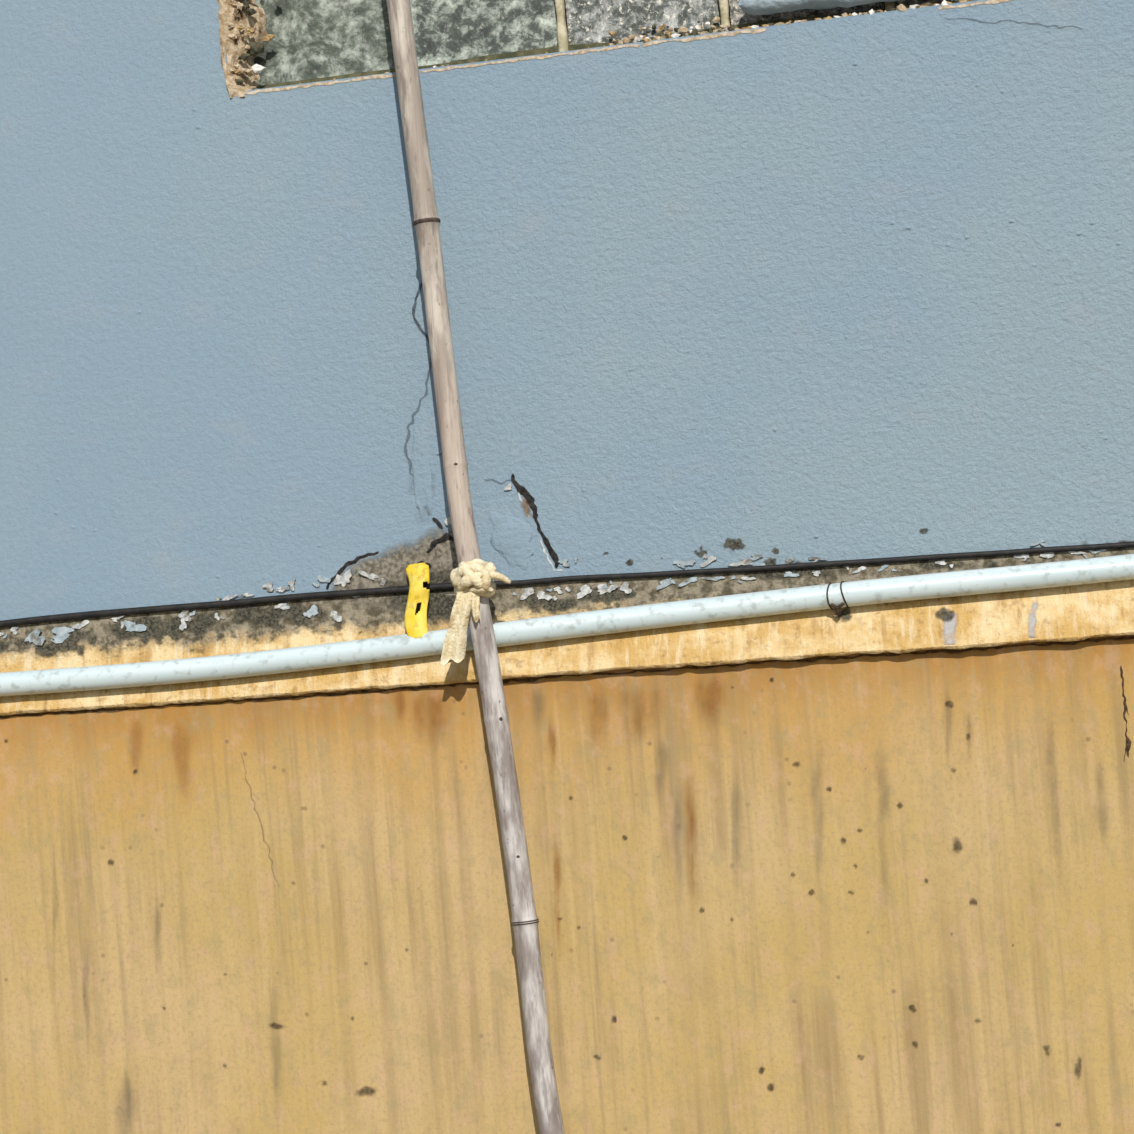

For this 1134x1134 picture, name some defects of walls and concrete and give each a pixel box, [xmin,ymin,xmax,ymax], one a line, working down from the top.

crack [404,283,432,477]
crack [486,474,562,571]
spalling [303,517,458,622]
peeling [657,554,765,590]
peeling [0,619,90,645]
water stain [0,627,96,656]
peeling [111,606,147,632]
water stain [112,611,220,642]
water stain [233,597,322,628]
peeling [513,580,632,601]
water stain [526,587,636,611]
crack [0,635,1134,761]